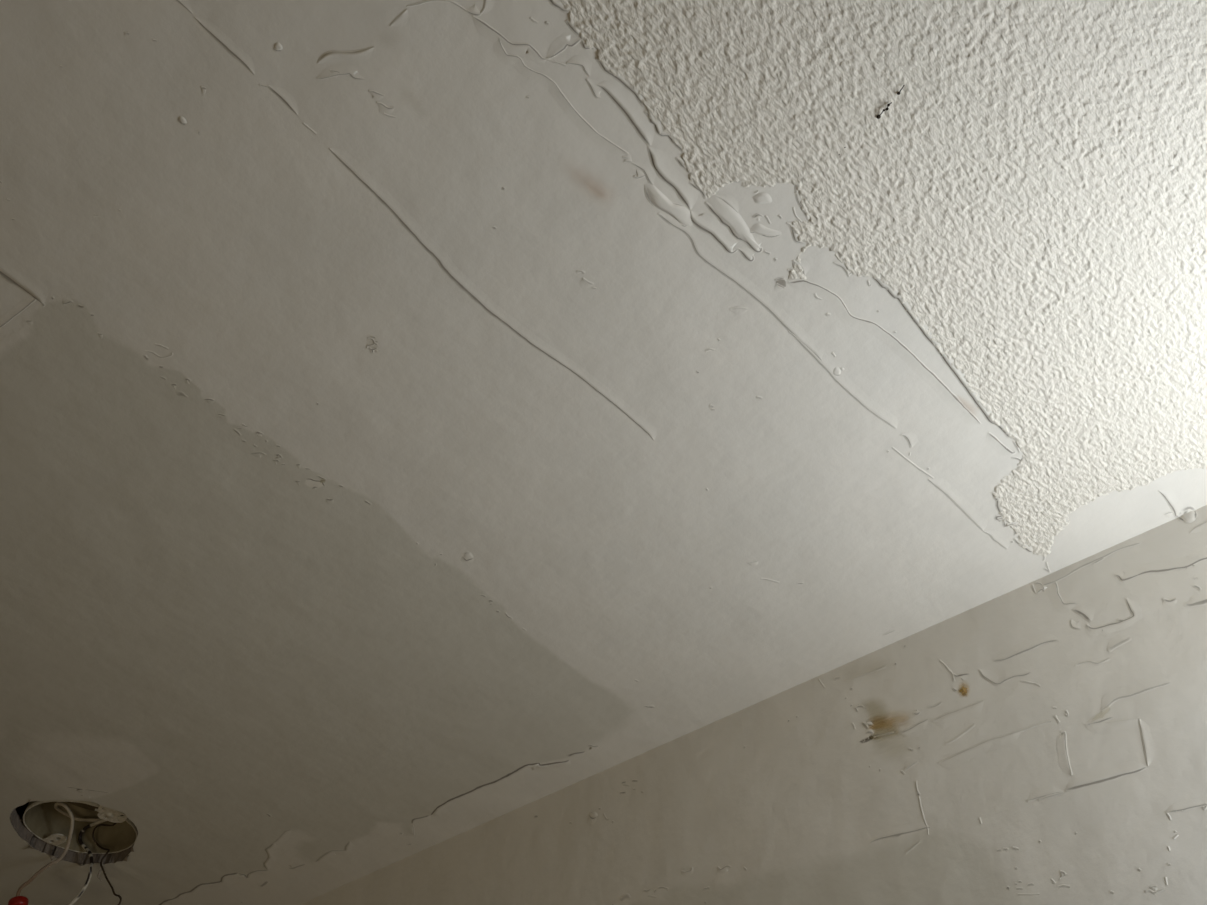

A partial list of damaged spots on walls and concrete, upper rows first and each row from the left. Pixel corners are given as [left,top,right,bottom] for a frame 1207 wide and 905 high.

peeling [548,0,810,261]
crack [175,0,657,440]
crack [0,249,48,328]
peeling [990,491,1051,573]
spalling [1162,577,1207,608]
crack [400,744,599,846]